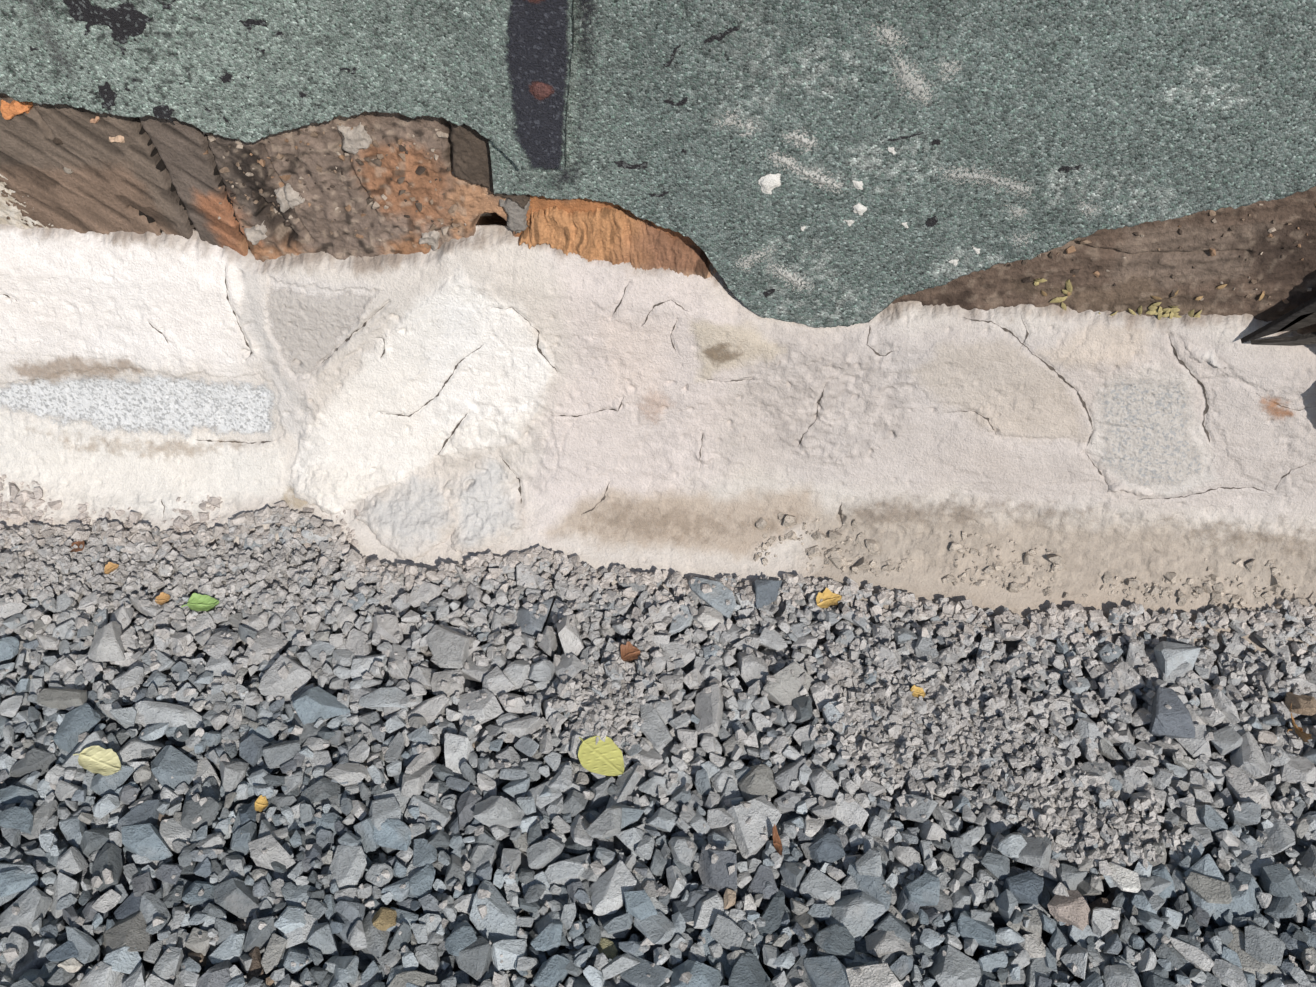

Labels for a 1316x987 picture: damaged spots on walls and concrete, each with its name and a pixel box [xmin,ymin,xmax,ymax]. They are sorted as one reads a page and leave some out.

peeling [0,174,56,230]
crack [321,305,385,364]
crack [493,307,557,371]
crack [612,288,690,351]
crack [198,438,271,446]
crack [380,344,484,417]
crack [438,414,467,455]
crack [798,385,826,446]
crack [964,317,1109,487]
crack [1169,336,1210,442]
crack [1141,465,1305,500]